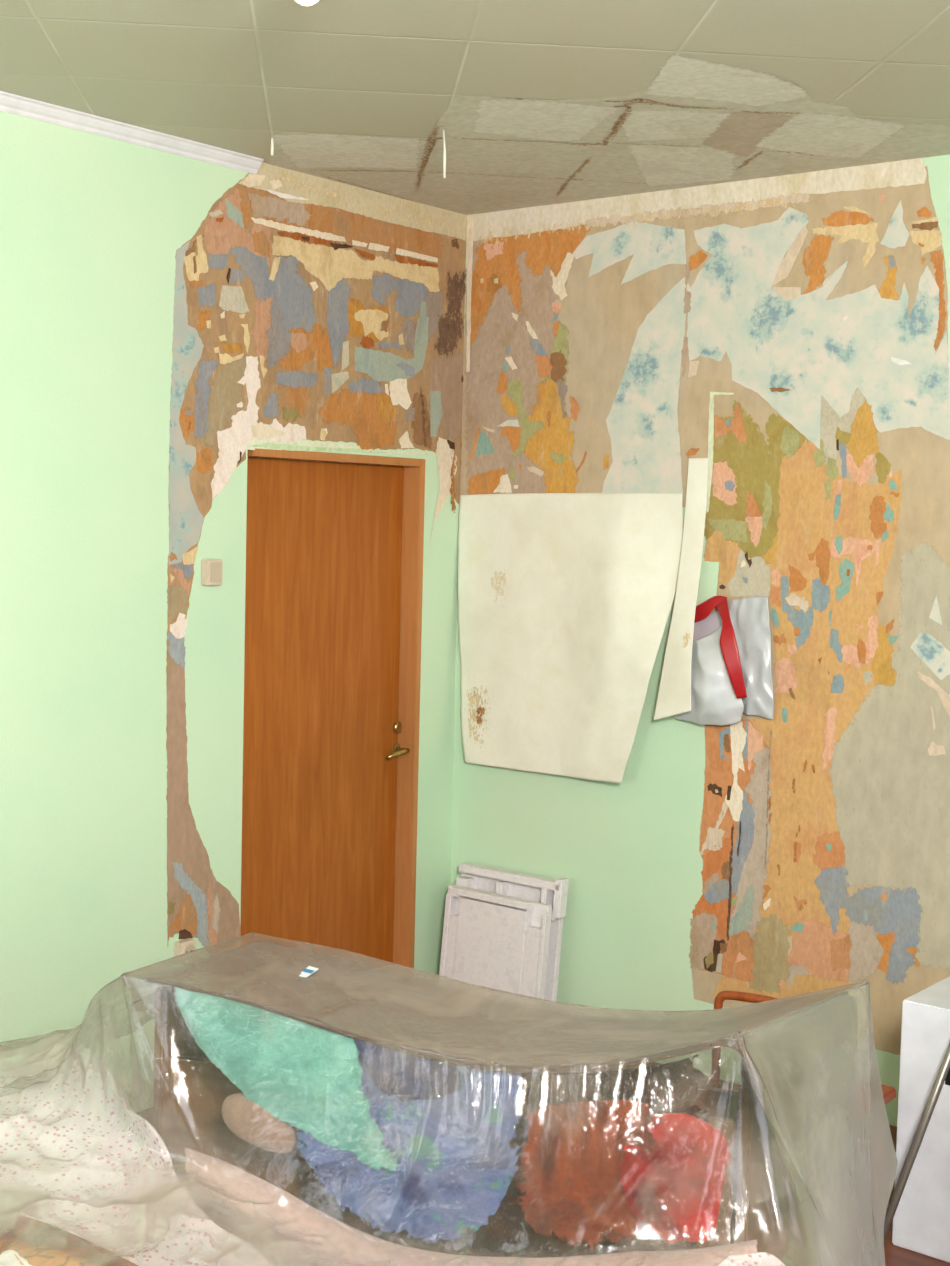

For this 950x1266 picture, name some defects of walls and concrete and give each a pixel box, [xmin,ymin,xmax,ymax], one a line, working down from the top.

flaking render [184,235,209,281]
flaking render [238,55,950,542]
flaking render [206,311,328,499]
flaking render [182,546,198,565]
peeling [689,388,922,1003]
flaking render [179,929,193,939]